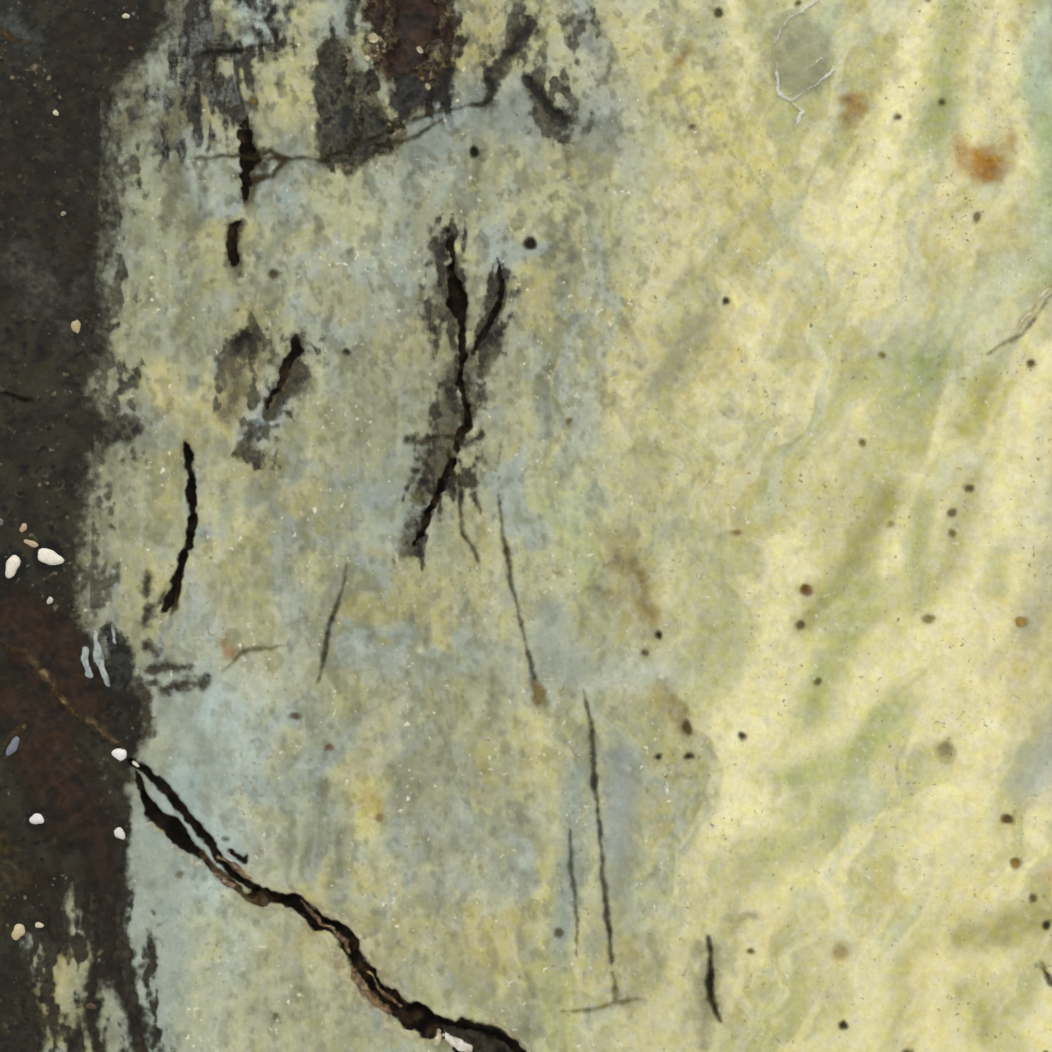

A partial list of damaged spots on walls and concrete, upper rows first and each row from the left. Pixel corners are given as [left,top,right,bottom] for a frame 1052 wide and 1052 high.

leakage [0,0,177,1052]
spalling [312,0,488,174]
crack [402,213,546,704]
corrosion [962,149,1003,179]
crack [990,281,1052,352]
crack [12,648,527,1052]
crack [569,831,578,941]
crack [574,700,630,1012]